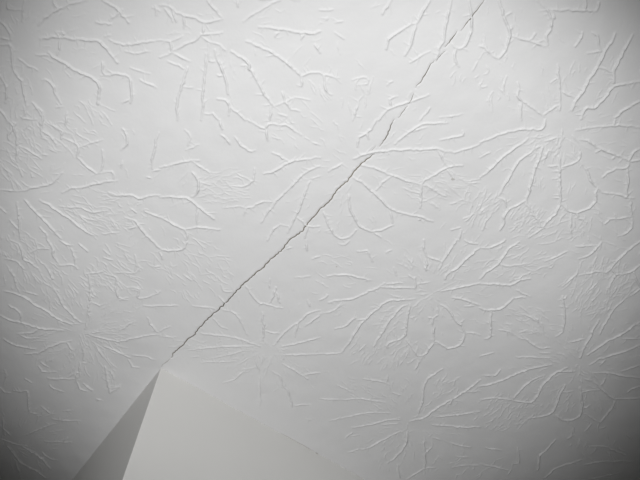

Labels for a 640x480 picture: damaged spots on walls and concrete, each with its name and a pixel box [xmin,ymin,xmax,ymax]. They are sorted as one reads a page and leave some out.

crack [161,2,483,367]